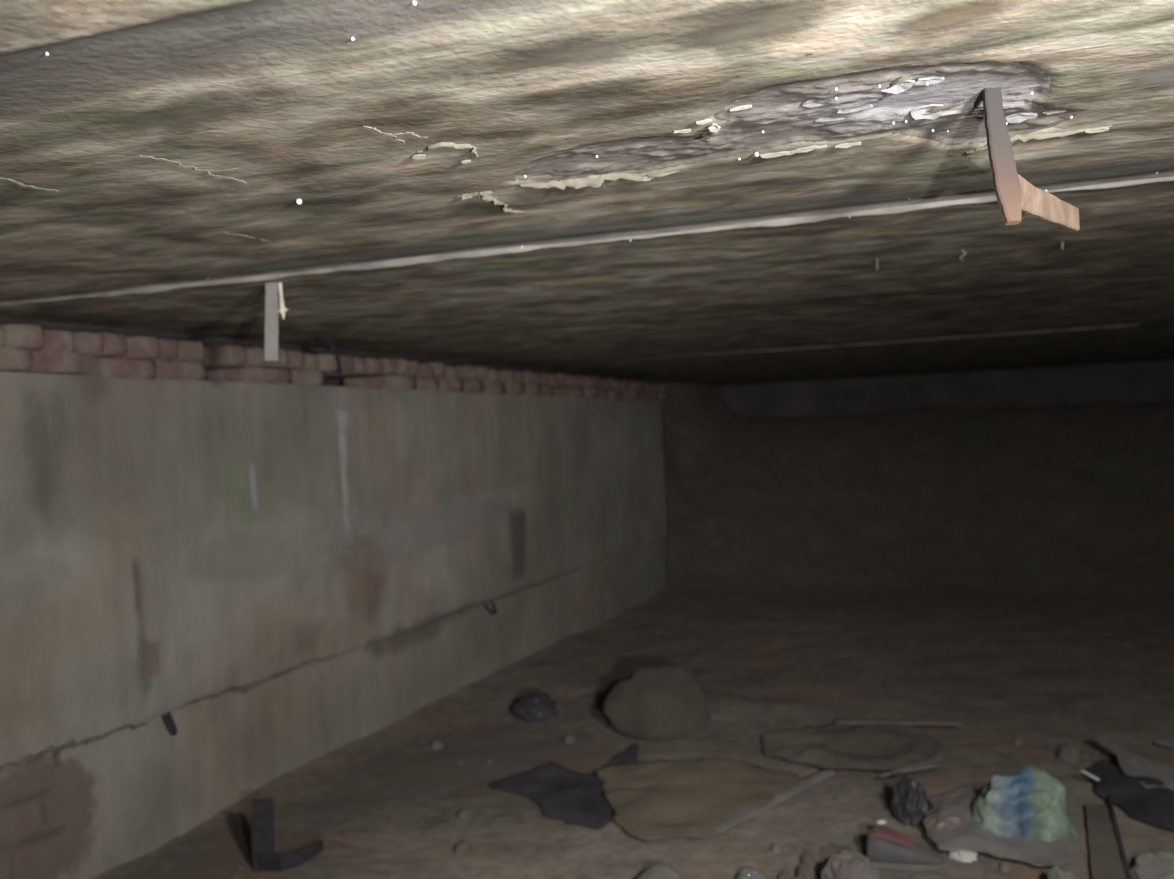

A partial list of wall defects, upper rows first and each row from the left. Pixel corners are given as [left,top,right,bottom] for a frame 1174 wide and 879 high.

spalling [508,62,1112,190]
peeling [458,191,525,213]
crack [180,655,337,708]
crack [0,723,148,770]